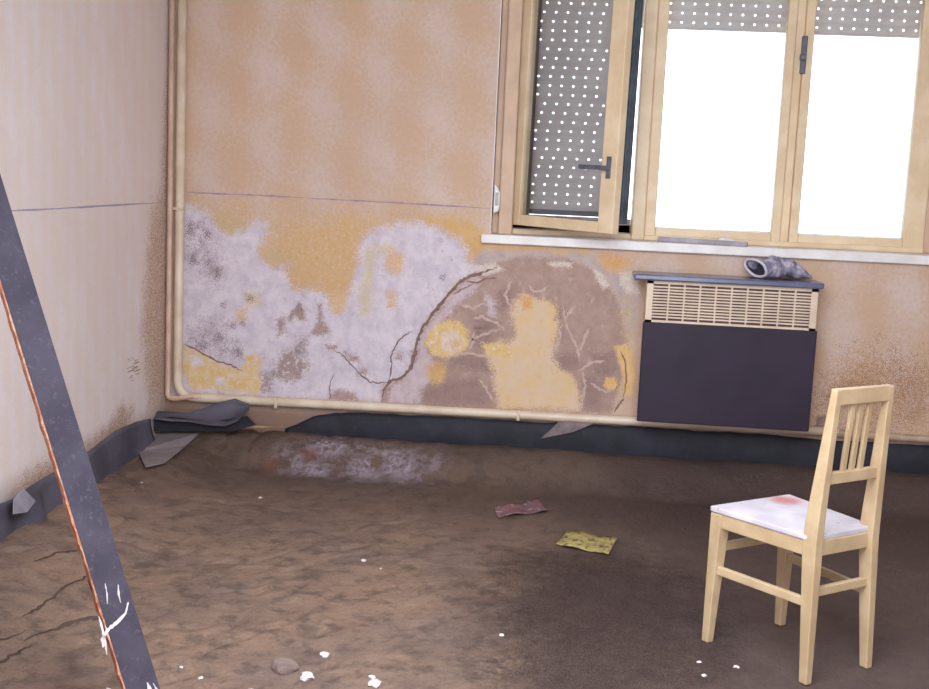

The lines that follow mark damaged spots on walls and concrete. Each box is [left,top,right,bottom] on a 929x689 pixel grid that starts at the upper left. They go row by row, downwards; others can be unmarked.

leakage [84,32,635,452]
peeling [171,201,644,415]
crack [329,267,497,399]
leakage [804,328,929,444]
leakage [7,456,54,500]
leakage [264,436,460,489]
crack [34,550,78,562]
crack [0,576,99,663]